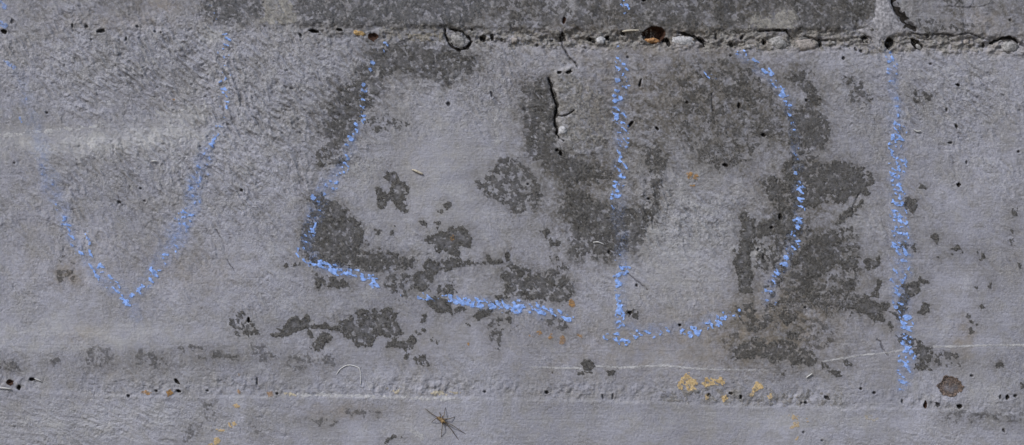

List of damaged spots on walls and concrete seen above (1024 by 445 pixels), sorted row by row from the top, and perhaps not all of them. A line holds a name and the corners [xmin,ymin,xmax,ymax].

crack [548,79,559,135]
damp [296,0,873,170]
damp [229,78,669,367]
damp [671,59,963,377]
corrosion [936,375,964,397]